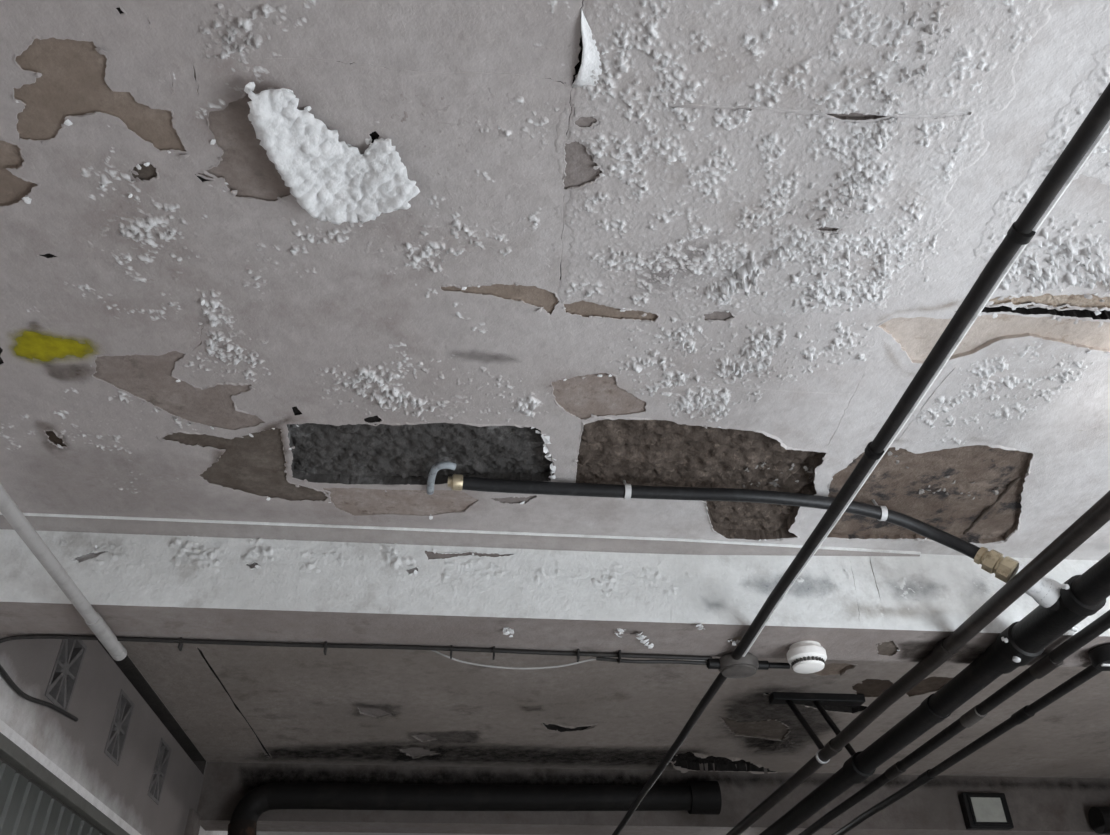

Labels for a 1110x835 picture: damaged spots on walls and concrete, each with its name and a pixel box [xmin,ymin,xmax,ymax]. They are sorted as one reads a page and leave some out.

peeling [0,35,189,208]
peeling [192,79,292,203]
peeling [561,115,605,191]
peeling [439,283,660,323]
spalling [876,305,960,365]
spalling [948,293,1110,361]
spalling [91,350,557,520]
spalling [550,372,865,542]
spalling [826,445,1035,545]
spalling [669,751,778,774]